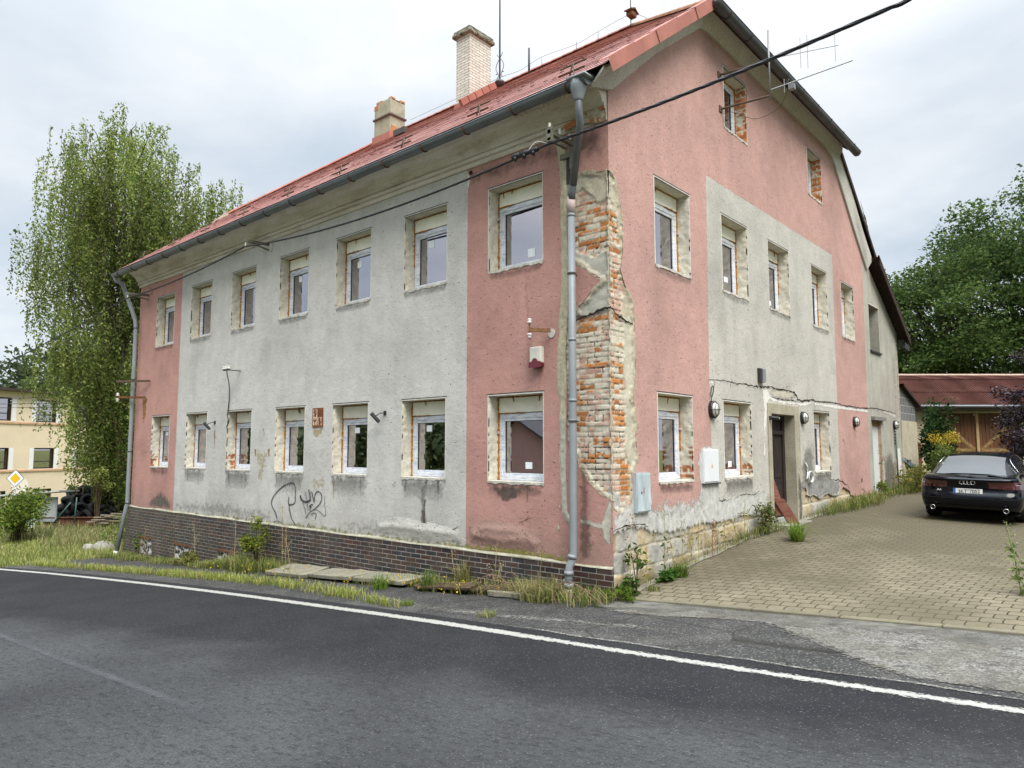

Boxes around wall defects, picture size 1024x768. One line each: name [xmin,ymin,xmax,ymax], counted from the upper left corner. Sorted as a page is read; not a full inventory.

flaking render [566,168,769,596]
crack [709,379,897,415]
water stain [495,487,530,501]